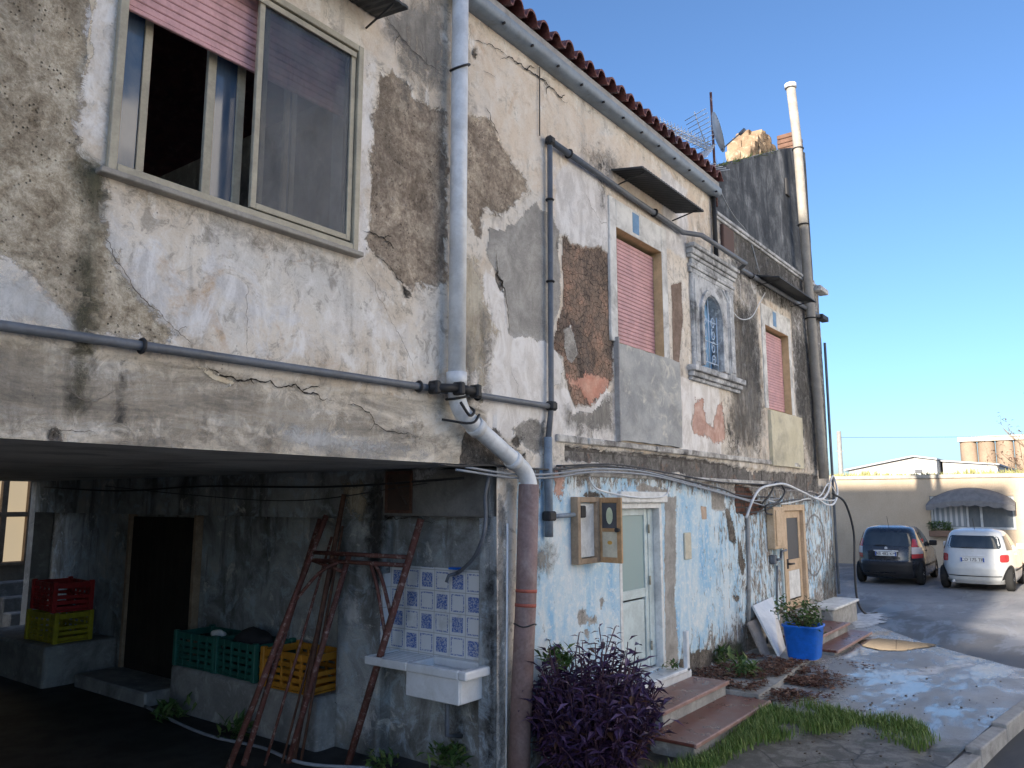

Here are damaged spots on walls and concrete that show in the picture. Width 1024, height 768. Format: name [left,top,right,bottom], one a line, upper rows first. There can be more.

crack [475,26,565,102]
water stain [74,159,108,215]
spalling [365,68,450,298]
spalling [467,116,531,239]
water stain [0,228,94,404]
crack [104,231,417,436]
crack [496,255,510,329]
spalling [554,235,614,408]
peeling [690,397,726,444]
peeling [577,598,604,638]
flaking render [636,482,716,672]
flaking render [701,484,765,575]